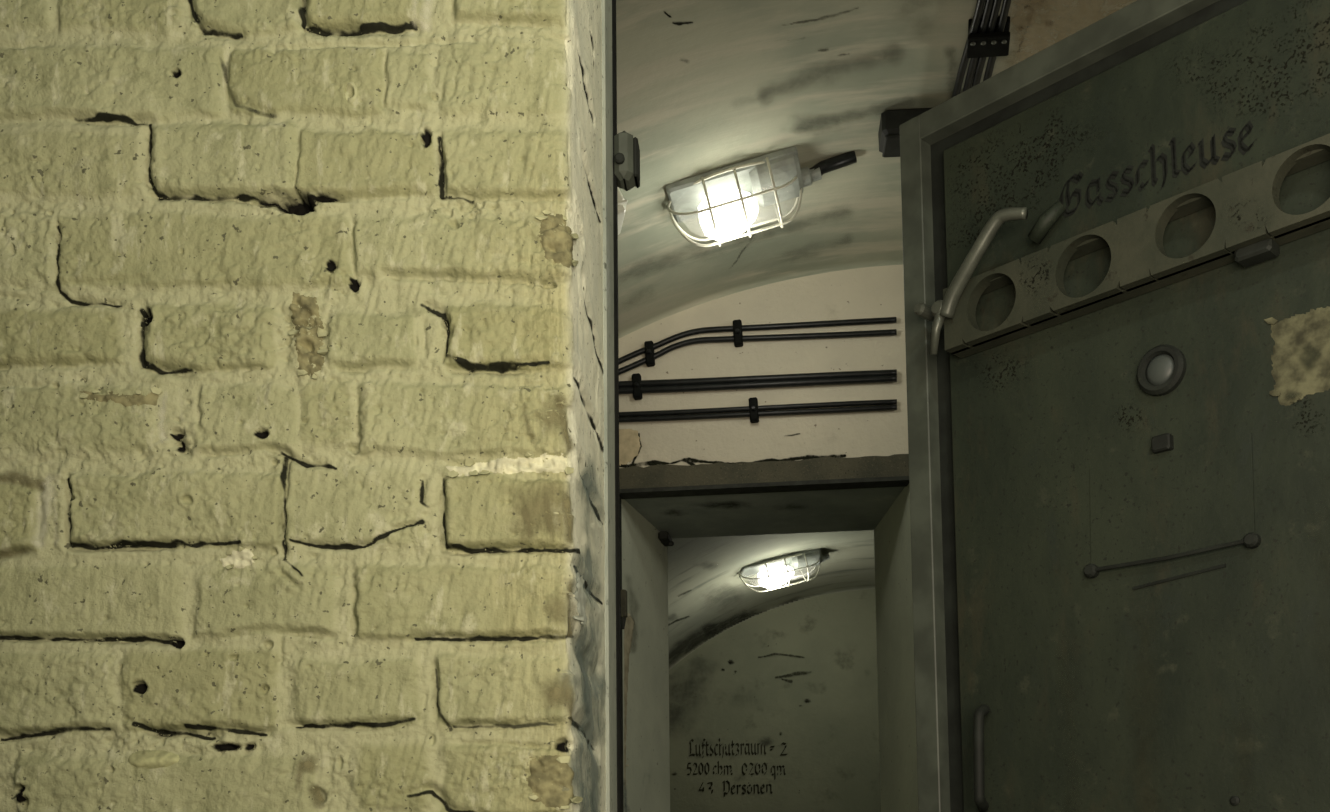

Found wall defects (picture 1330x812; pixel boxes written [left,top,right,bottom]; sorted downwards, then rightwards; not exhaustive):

spalling [535,210,579,268]
spalling [619,429,732,467]
spalling [754,454,846,462]